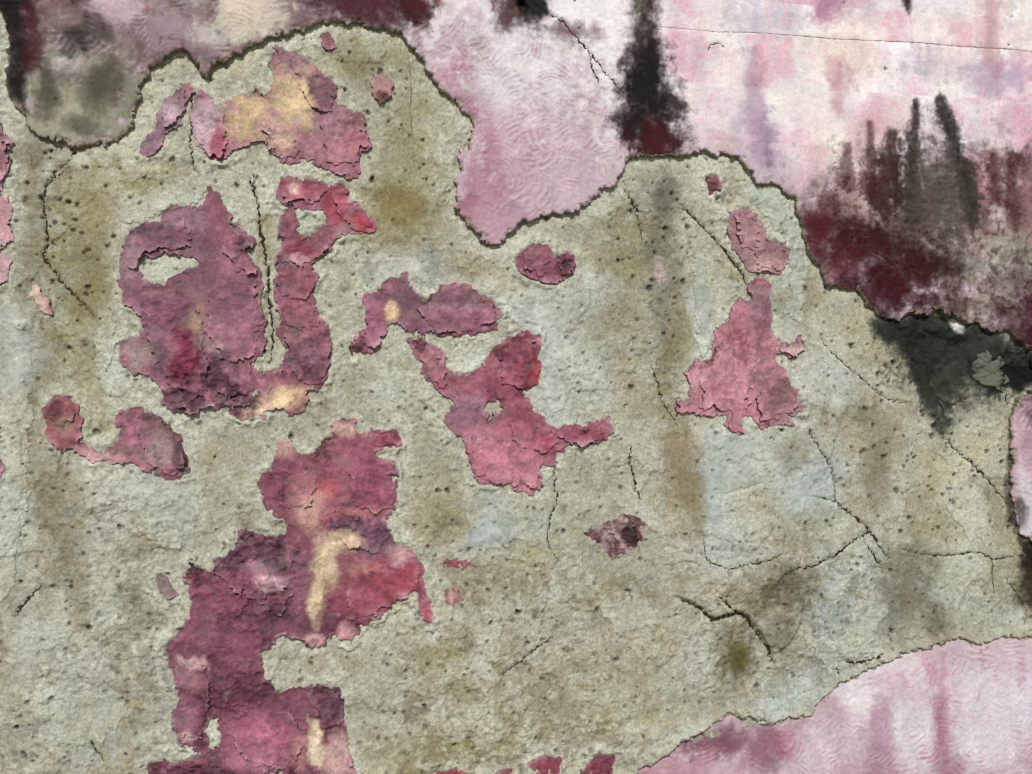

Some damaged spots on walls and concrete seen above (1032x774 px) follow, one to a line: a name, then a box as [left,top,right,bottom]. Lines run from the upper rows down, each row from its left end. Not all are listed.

water stain [0,0,80,103]
water stain [500,0,549,26]
water stain [613,0,684,155]
crack [41,149,94,316]
peeling [116,187,268,415]
peeling [228,175,377,421]
peeling [349,271,502,356]
water stain [862,94,979,269]
peeling [406,330,614,496]
peeling [141,418,433,774]
crack [682,597,773,661]
crack [701,429,1024,604]